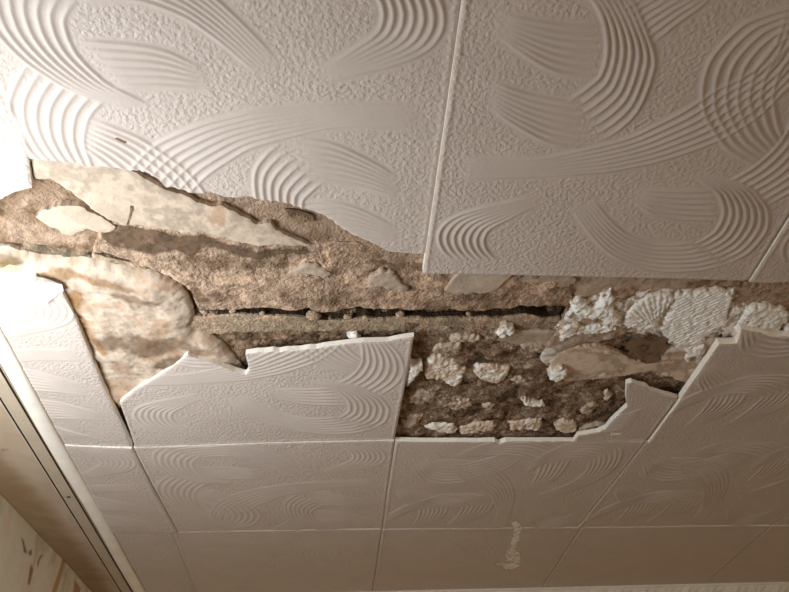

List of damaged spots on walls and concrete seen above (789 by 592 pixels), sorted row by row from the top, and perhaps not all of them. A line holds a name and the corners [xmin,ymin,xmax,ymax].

damp [0,257,21,267]
crack [0,241,147,270]
damp [102,226,309,259]
crack [184,285,562,320]
spalling [0,159,789,440]